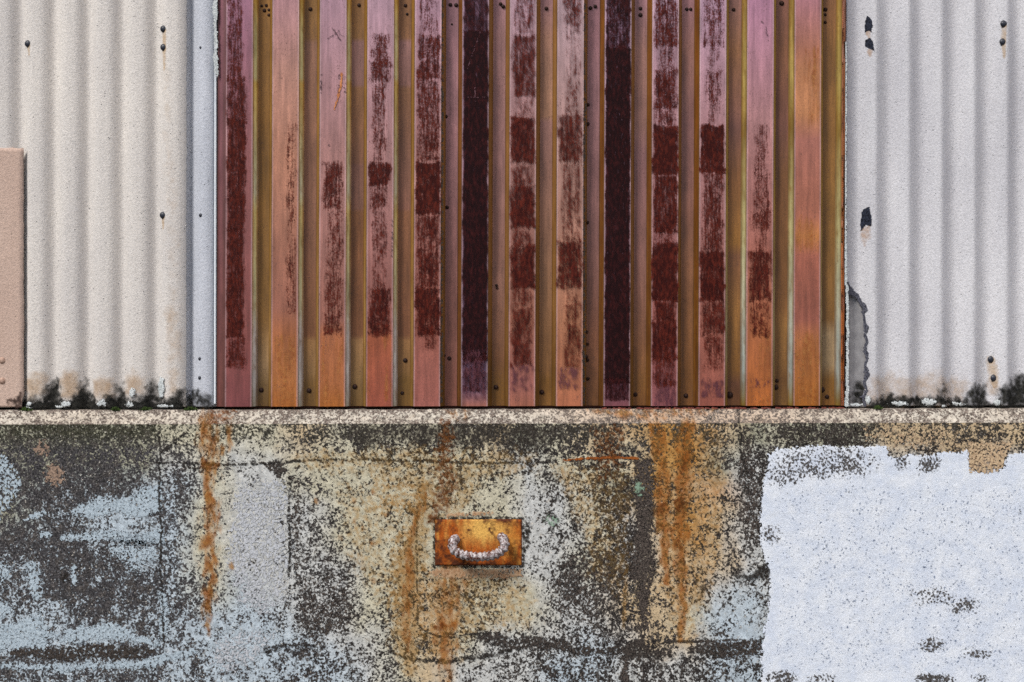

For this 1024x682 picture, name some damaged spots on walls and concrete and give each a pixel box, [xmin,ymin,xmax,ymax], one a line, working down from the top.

damp [6,377,212,410]
corrosion [225,0,247,368]
corrosion [367,34,393,337]
corrosion [414,0,442,348]
corrosion [461,0,489,399]
corrosion [509,0,536,390]
corrosion [604,0,632,401]
corrosion [650,0,680,406]
corrosion [699,0,726,398]
peeling [844,42,872,407]
peeling [758,424,1024,682]
damp [853,374,1024,409]